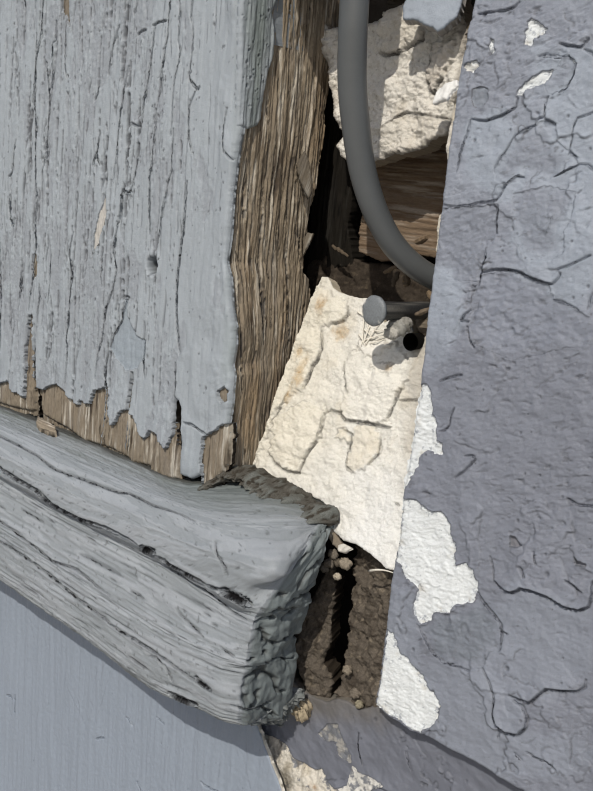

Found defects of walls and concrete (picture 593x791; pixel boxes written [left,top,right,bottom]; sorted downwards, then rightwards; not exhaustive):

crack [0,0,73,385]
crack [92,0,198,445]
crack [444,38,593,233]
peeling [0,315,187,479]
crack [1,436,192,520]
peeling [202,423,239,483]
crack [269,389,417,474]
peeling [404,384,443,489]
crack [0,467,252,619]
peeling [396,499,478,624]
peeling [377,631,441,733]
peeling [265,724,383,791]